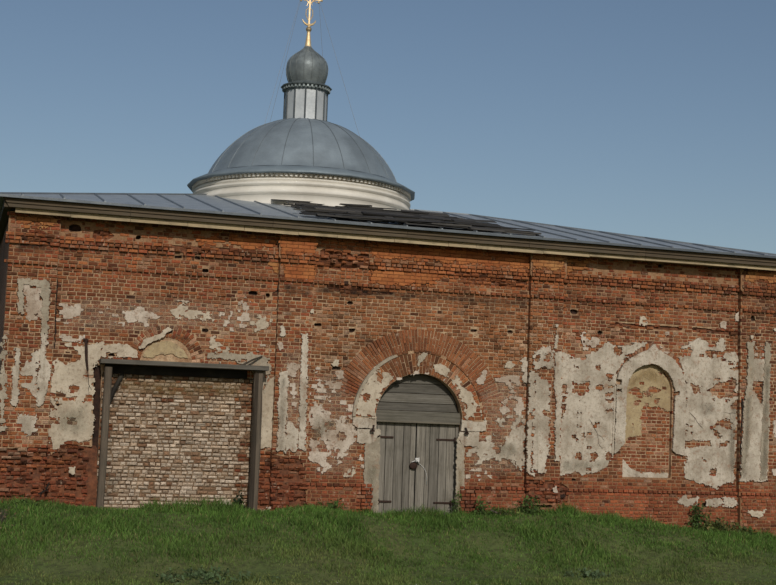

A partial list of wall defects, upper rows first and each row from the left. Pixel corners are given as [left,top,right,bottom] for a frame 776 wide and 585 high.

peeling [23,284,43,321]
peeling [56,303,85,325]
peeling [0,327,188,507]
peeling [99,305,160,327]
spalling [170,291,402,511]
peeling [411,331,671,508]
peeling [610,312,776,508]